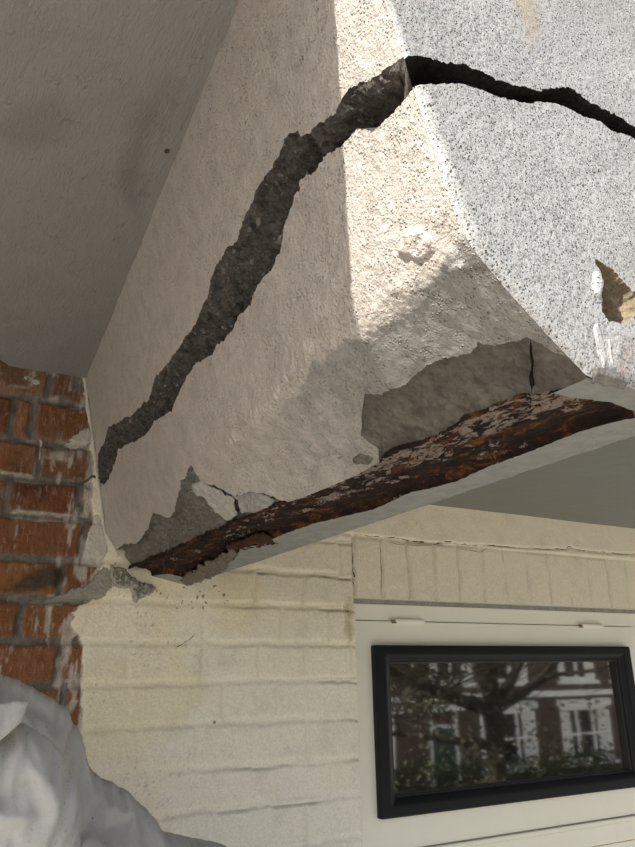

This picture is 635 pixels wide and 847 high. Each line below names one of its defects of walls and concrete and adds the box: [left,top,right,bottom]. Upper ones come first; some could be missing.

peeling [63,428,94,451]
spalling [80,465,280,603]
crack [69,55,635,486]
corrosion [128,388,635,604]
crack [348,534,628,585]
spalling [353,258,635,465]